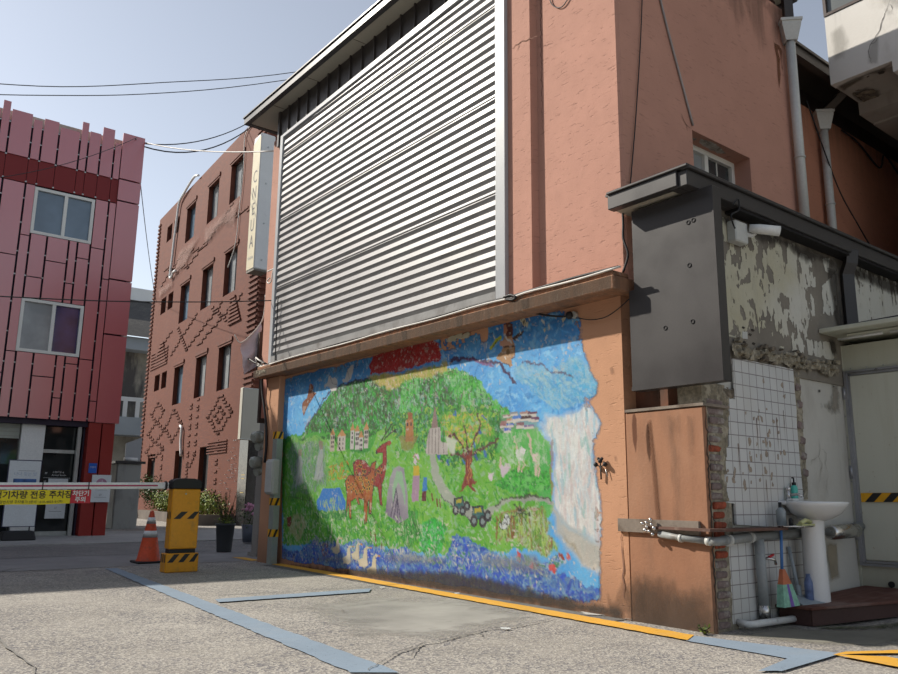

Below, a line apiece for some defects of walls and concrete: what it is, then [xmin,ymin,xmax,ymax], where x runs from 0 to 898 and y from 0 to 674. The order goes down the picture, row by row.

peeling [722,217,835,360]
peeling [854,267,898,322]
spalling [781,372,809,499]
flaking render [677,384,786,633]
water stain [335,569,706,632]